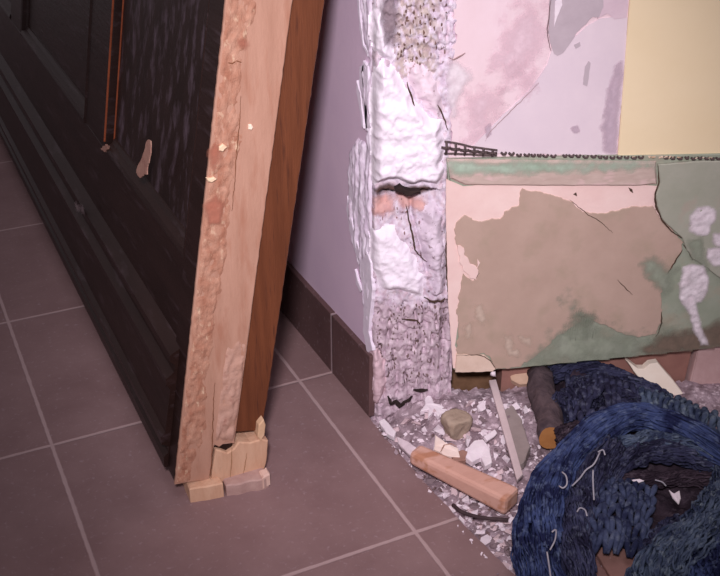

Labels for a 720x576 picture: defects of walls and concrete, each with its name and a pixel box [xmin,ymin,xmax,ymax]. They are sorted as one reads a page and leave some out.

crack [406,207,427,262]
peeling [346,0,720,423]